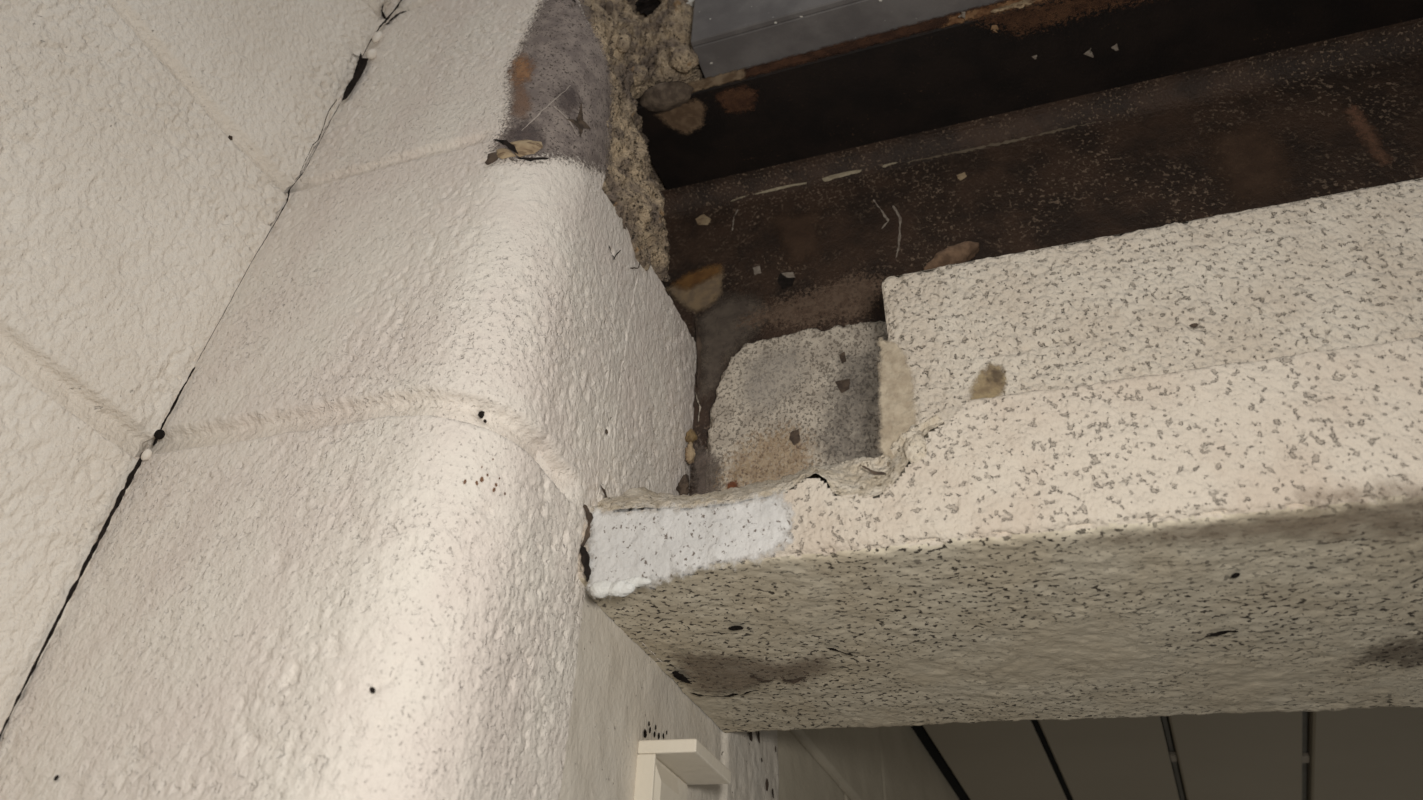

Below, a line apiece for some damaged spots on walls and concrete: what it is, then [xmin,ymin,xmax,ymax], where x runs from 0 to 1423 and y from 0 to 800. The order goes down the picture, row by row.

crack [353,0,406,58]
spalling [485,0,699,282]
corrosion [990,0,1035,33]
crack [0,100,340,737]